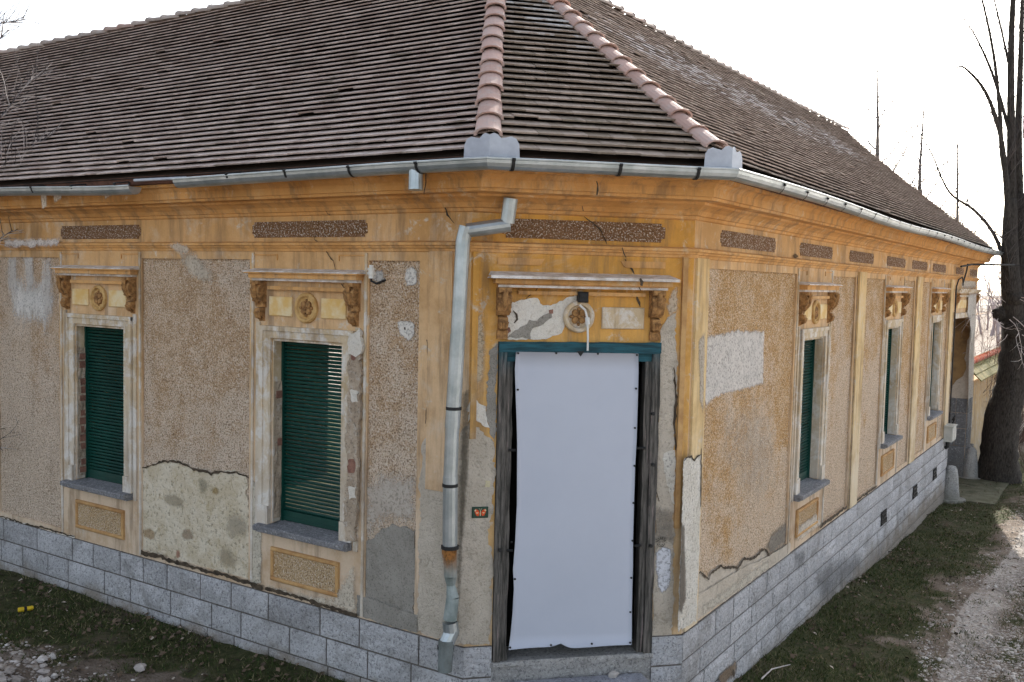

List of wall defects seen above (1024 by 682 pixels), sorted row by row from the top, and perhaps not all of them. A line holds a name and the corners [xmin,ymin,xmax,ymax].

flaking render [467,295,577,440]
flaking render [142,460,262,584]
flaking render [274,381,282,518]
peeling [273,569,355,611]
flaking render [347,459,356,473]
flaking render [417,438,446,638]
flaking render [663,449,821,632]